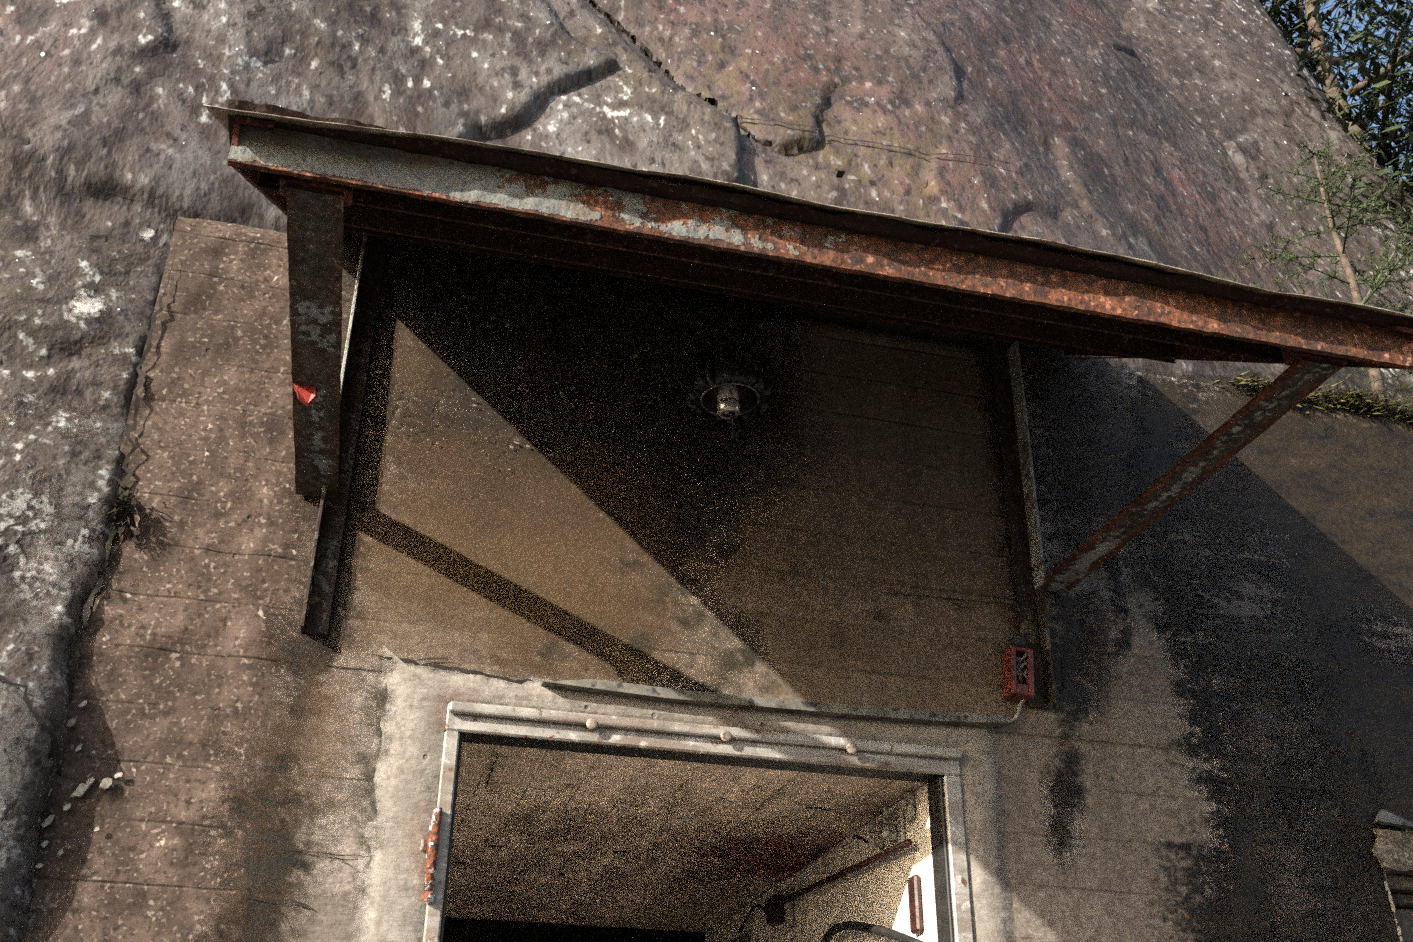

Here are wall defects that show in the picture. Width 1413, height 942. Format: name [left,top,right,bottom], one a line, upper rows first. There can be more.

damp [371,396,783,676]
damp [699,647,755,693]
damp [1027,347,1280,562]
damp [1046,375,1413,942]